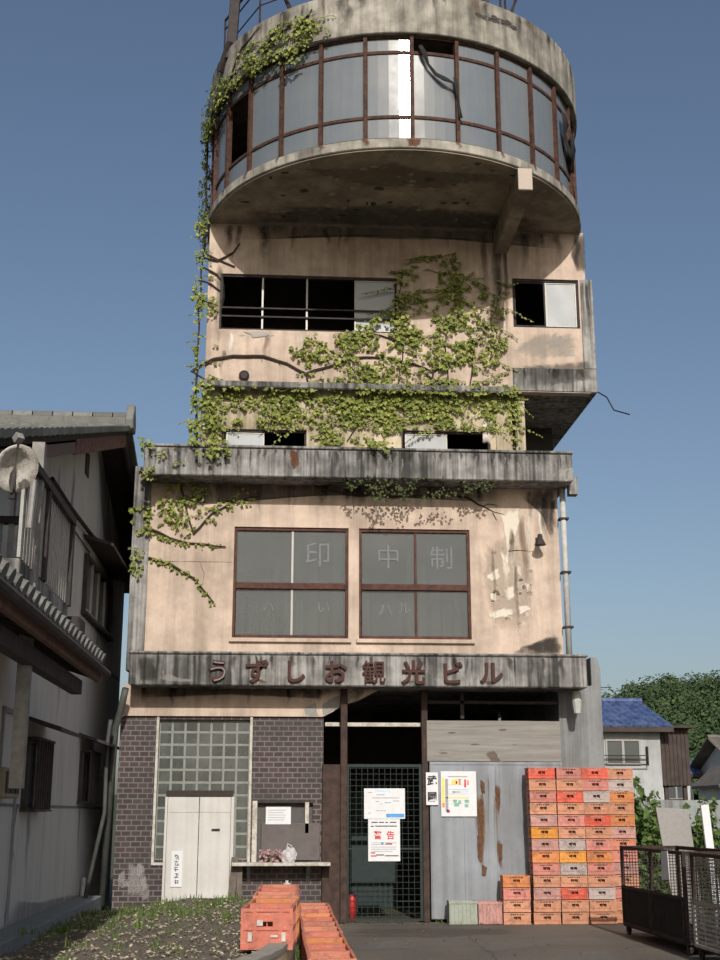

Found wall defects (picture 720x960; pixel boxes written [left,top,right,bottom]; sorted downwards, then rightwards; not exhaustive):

water stain [572,237,585,269]
peeling [487,547,535,627]
water stain [500,491,554,599]
corrosion [477,780,500,876]